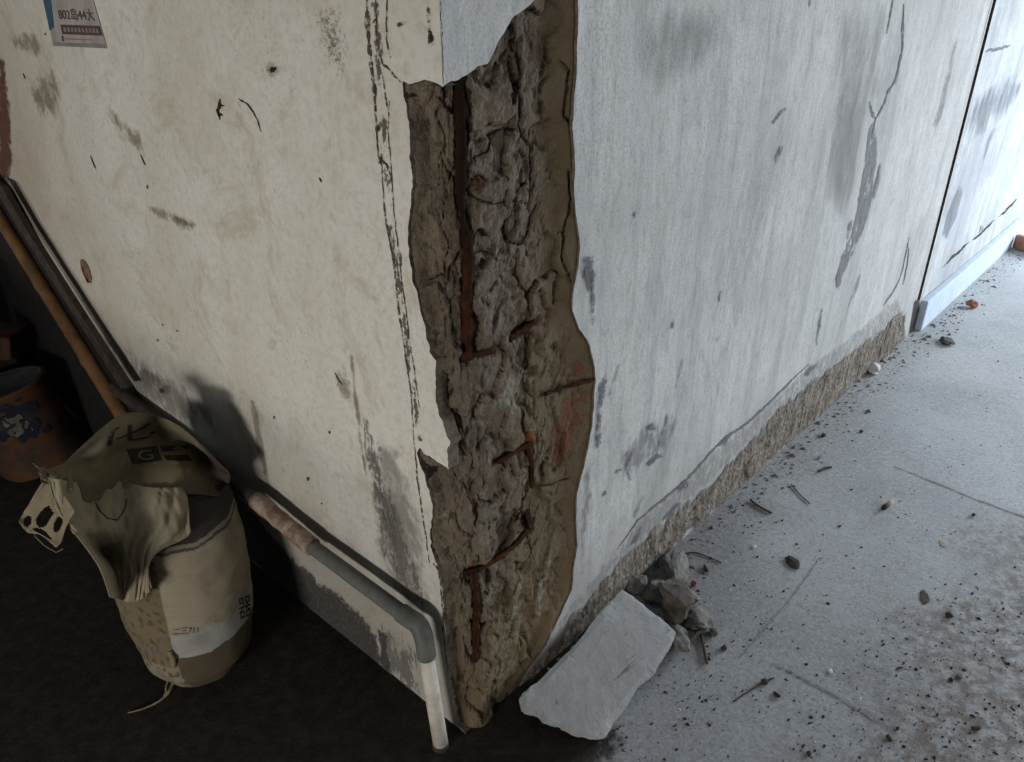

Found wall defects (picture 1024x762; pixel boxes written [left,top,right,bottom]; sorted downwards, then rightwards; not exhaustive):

peeling [371,2,383,86]
crack [869,0,905,131]
peeling [377,118,392,205]
peeling [387,225,403,298]
crack [364,0,448,671]
spalling [402,0,905,728]
crack [883,237,910,306]
leakage [364,421,422,599]